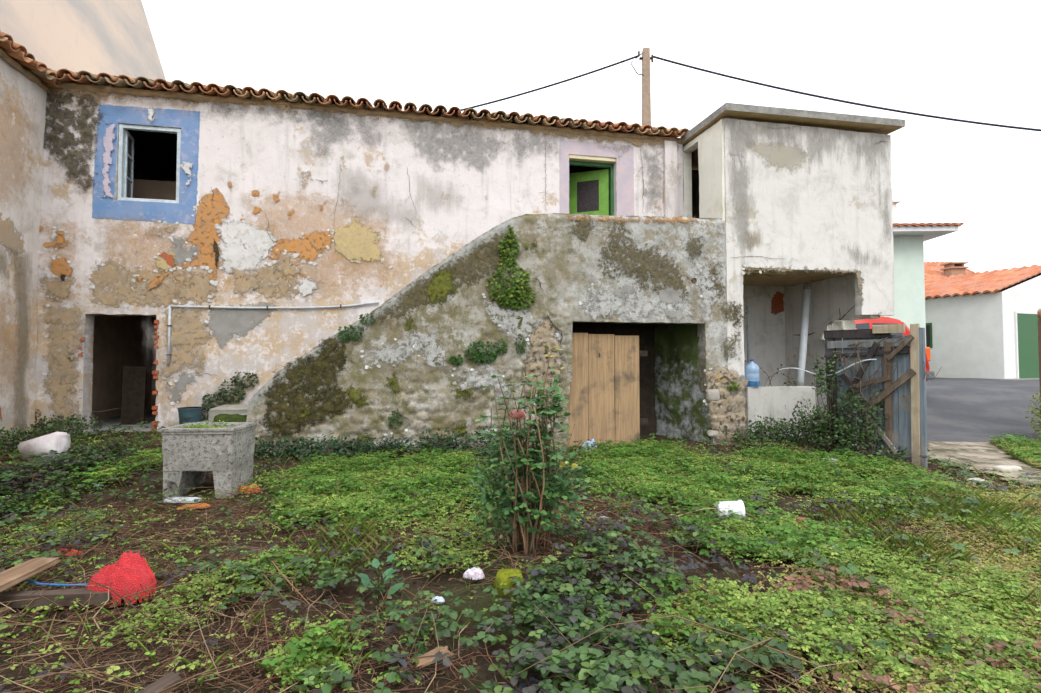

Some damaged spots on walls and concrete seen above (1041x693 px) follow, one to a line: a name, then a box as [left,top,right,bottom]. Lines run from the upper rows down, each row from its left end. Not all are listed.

water stain [43,82,665,203]
flaking render [39,226,87,427]
flaking render [88,181,393,405]
flaking render [771,291,784,315]
spalling [742,264,864,303]
spalling [819,320,855,343]